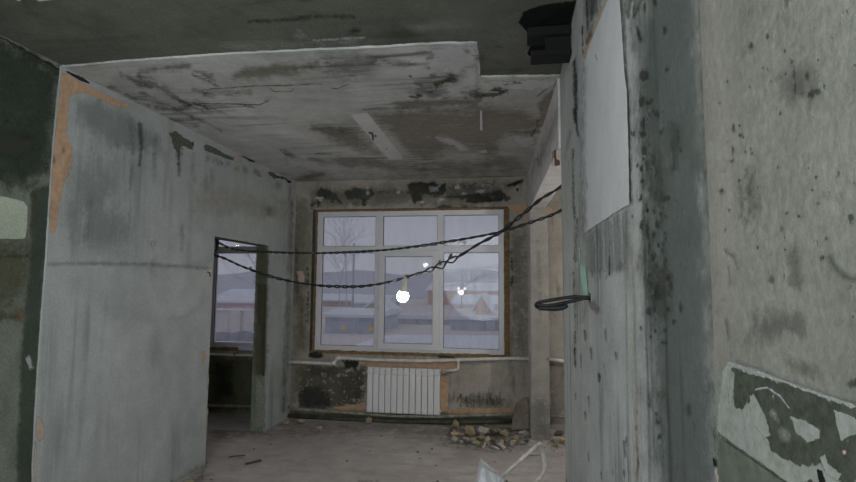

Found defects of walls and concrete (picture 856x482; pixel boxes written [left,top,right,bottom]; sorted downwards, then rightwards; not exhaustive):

flaking render [49,73,129,233]
spalling [169,131,291,183]
leakage [591,0,714,482]
peeling [717,361,856,482]